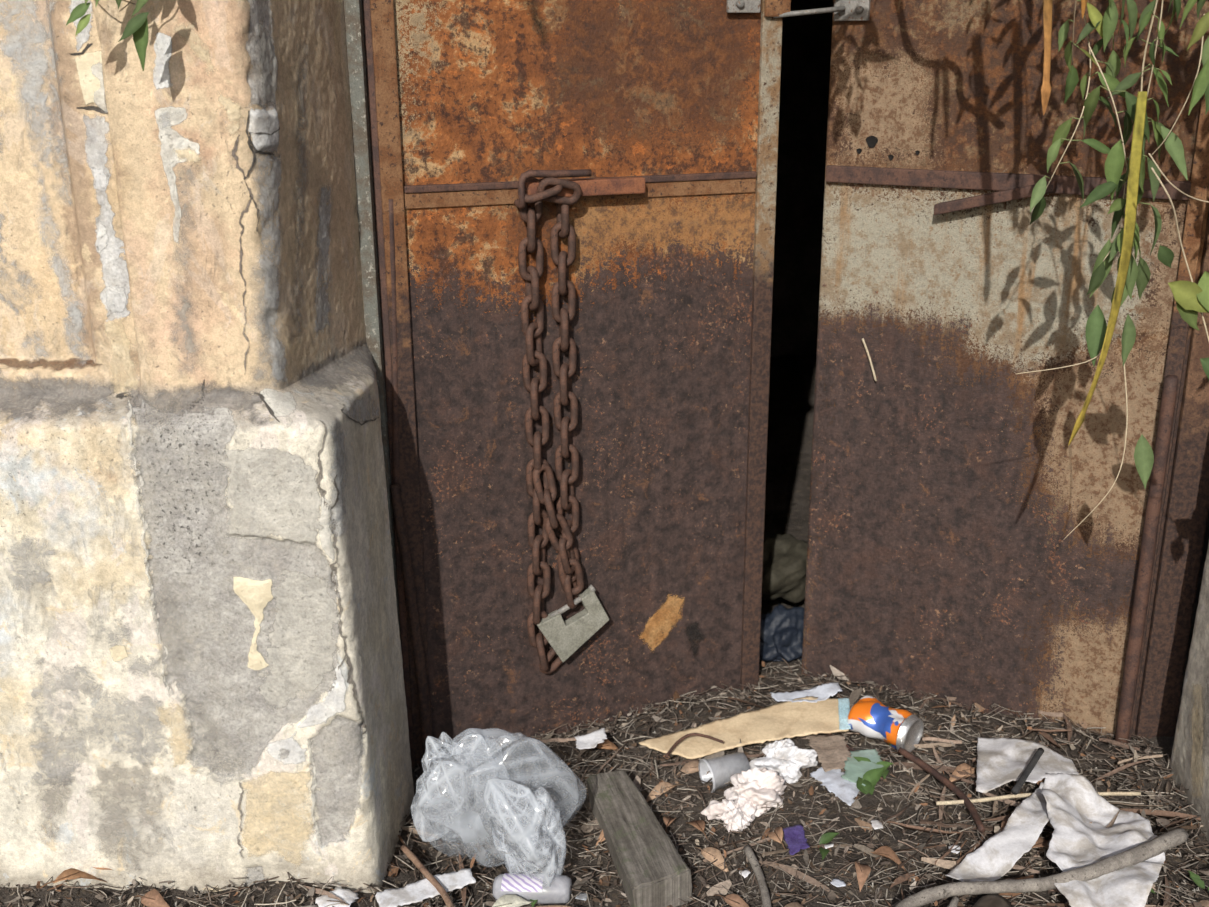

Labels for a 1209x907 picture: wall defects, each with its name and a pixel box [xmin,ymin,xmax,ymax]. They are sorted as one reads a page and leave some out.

crack [232,132,259,370]
spalling [69,0,365,886]
corrosion [640,594,703,655]